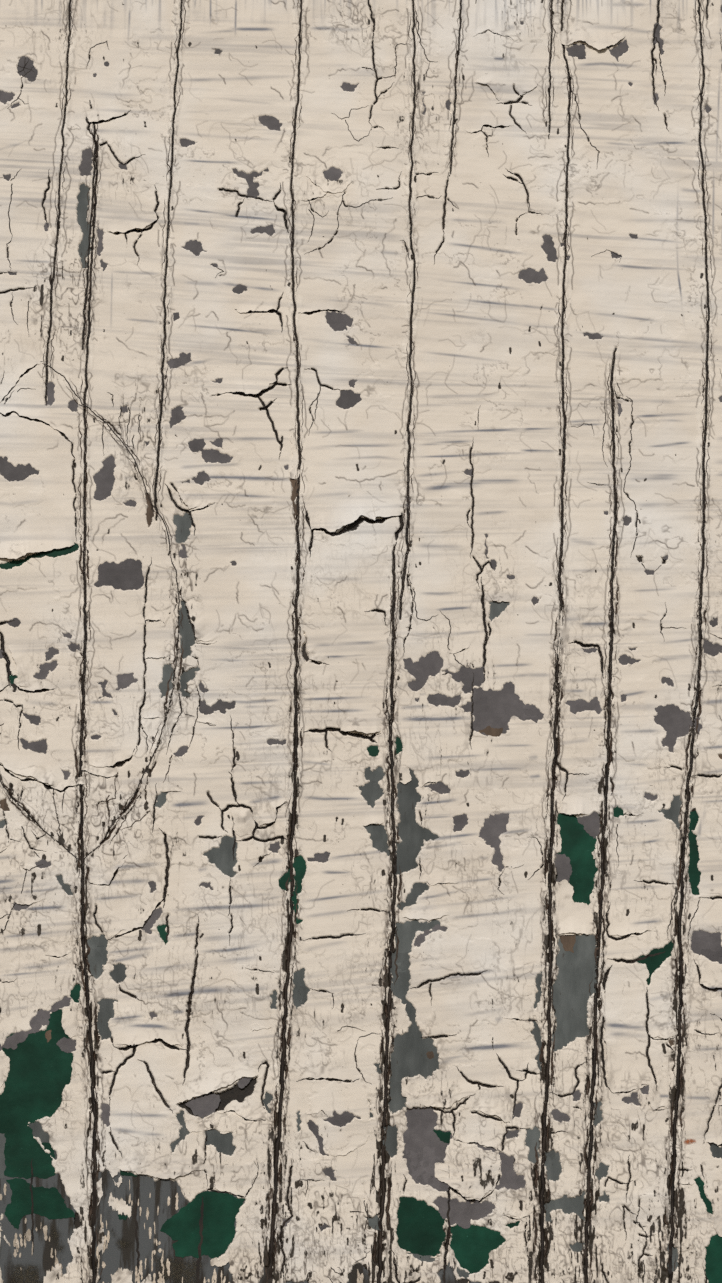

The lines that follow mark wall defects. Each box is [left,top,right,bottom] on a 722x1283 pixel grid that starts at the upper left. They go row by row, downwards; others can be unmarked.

crack [695,0,705,110]
crack [288,106,372,291]
peeling [181,438,233,485]
crack [0,92,217,1283]
crack [203,323,459,1283]
peeling [403,651,544,737]
crack [435,374,568,1283]
crack [582,243,722,1283]
peeling [654,704,703,753]
peeling [296,767,562,1230]
peeling [528,837,598,1071]
peeling [170,1077,273,1156]